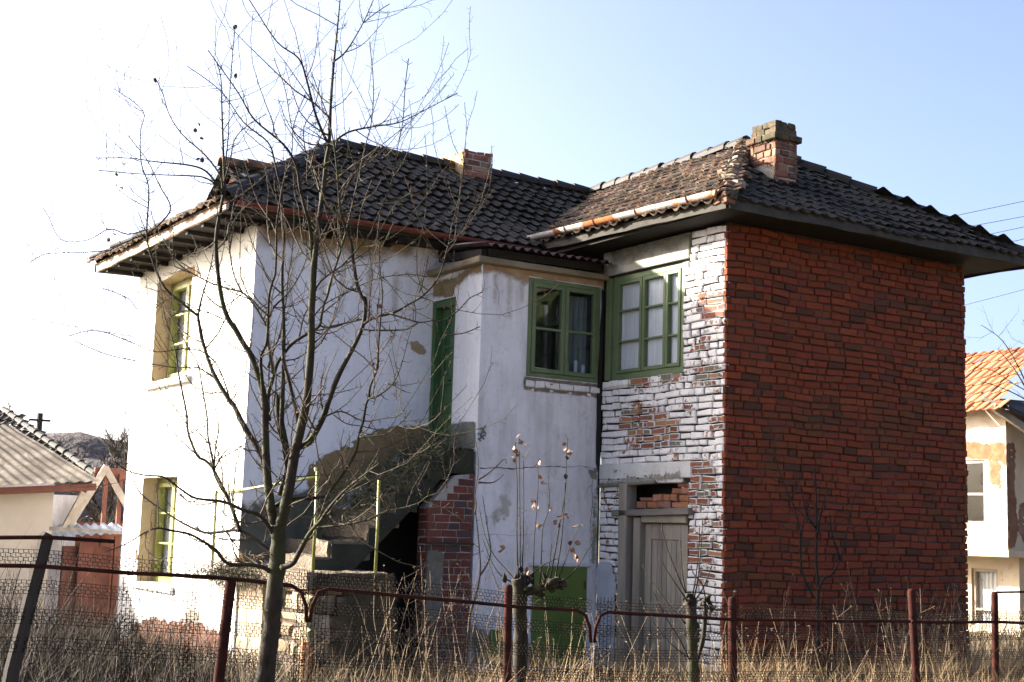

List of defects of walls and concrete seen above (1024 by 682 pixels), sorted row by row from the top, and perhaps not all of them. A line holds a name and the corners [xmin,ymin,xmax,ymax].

peeling [410,341,426,354]
peeling [619,289,724,454]
peeling [600,455,723,586]
peeling [966,441,1024,548]